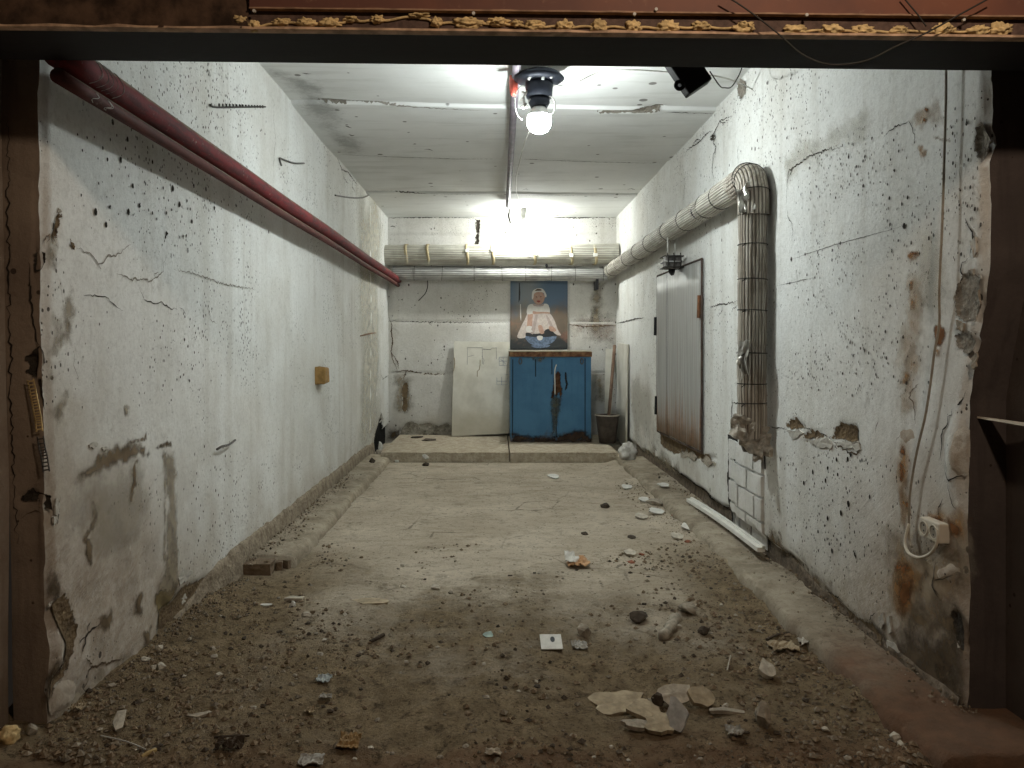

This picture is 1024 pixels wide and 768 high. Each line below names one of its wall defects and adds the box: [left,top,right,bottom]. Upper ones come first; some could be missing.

spalling [935,107,992,370]
crack [77,245,255,322]
corrosion [934,325,945,356]
water stain [79,434,178,615]
spalling [780,417,878,568]
corrosion [897,447,912,519]
corrosion [928,512,963,538]
spalling [48,593,78,697]
water stain [101,609,112,631]
corrosion [893,556,920,613]